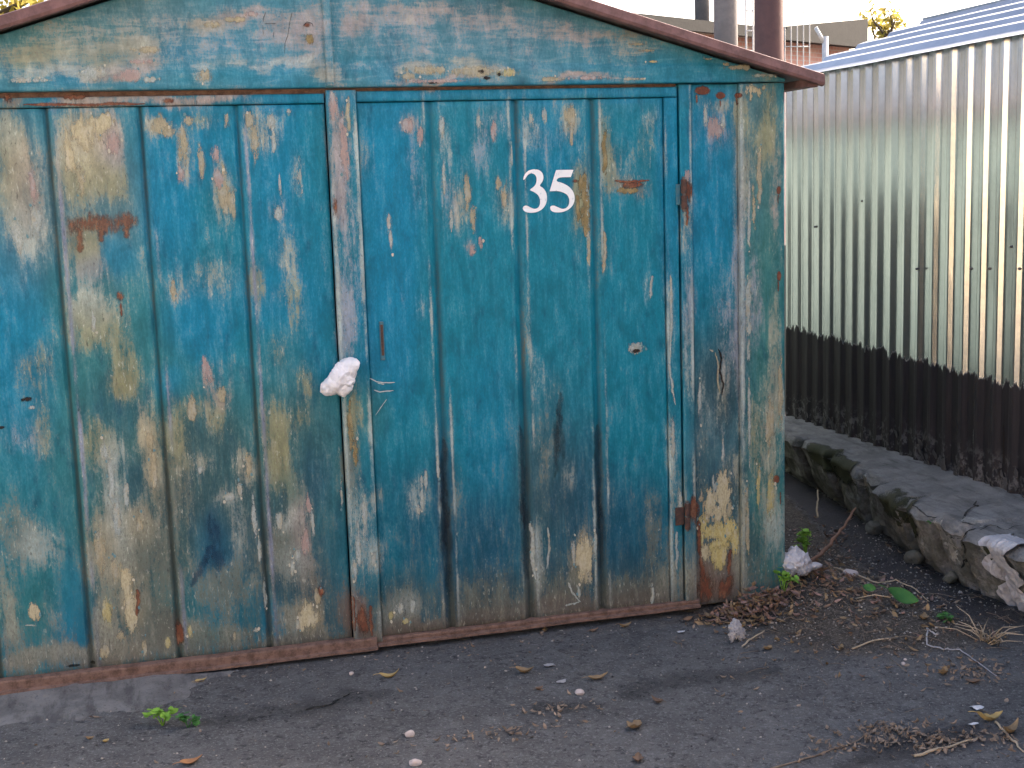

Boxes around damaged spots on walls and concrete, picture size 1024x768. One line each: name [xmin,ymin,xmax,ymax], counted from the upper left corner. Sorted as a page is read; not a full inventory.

peeling [395,65,521,84]
corrosion [695,85,742,107]
peeling [564,105,576,146]
peeling [64,112,123,197]
corrosion [615,180,649,194]
corrosion [680,170,692,225]
corrosion [68,212,137,253]
crack [709,349,724,394]
peeling [765,347,783,454]
peeling [696,377,777,571]
peeling [90,434,147,664]
corrosion [689,495,734,602]